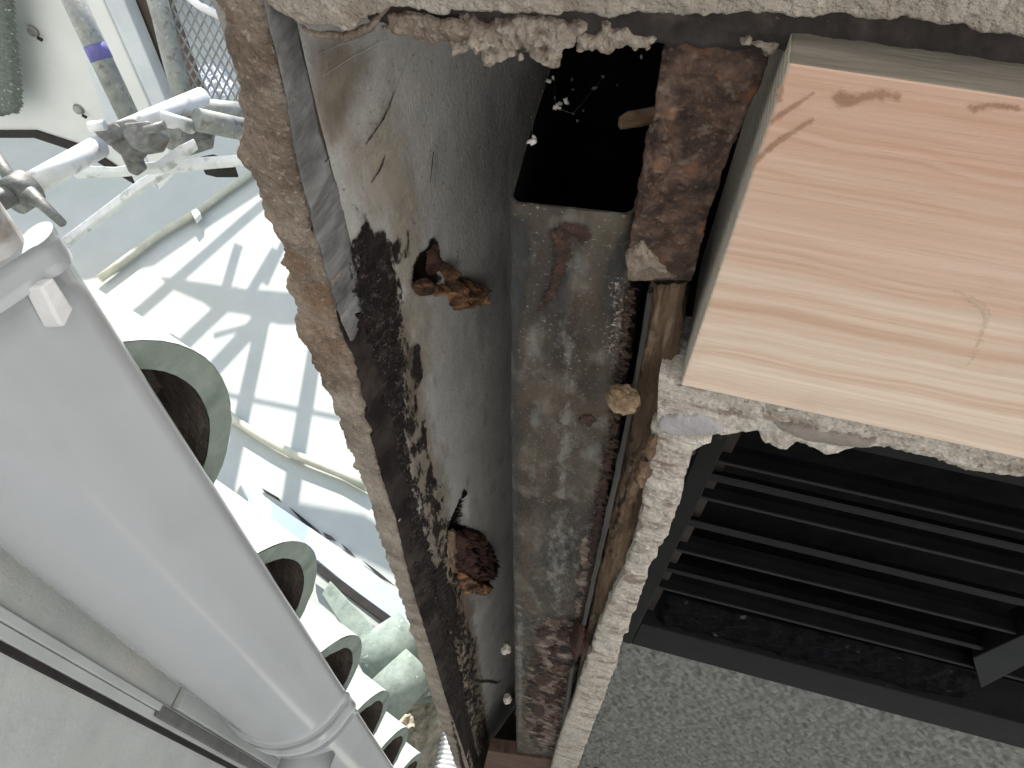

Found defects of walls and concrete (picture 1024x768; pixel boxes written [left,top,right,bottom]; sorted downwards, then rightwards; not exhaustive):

spalling [295,7,657,123]
spalling [739,35,779,57]
corrosion [537,222,591,311]
spalling [216,0,474,768]
corrosion [602,277,639,385]
spalling [634,434,658,488]
corrosion [519,410,622,751]